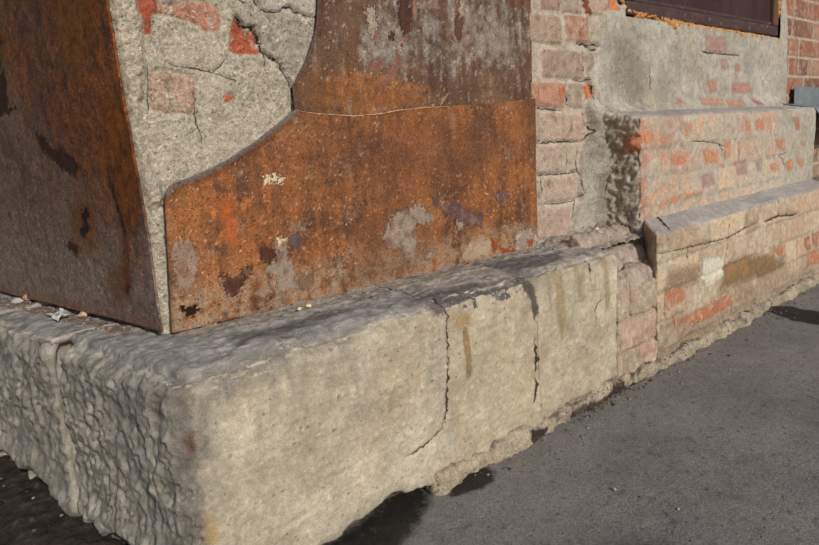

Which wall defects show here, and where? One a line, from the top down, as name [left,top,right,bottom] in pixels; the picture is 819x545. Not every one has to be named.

crack [168,61,235,80]
crack [235,0,316,89]
corrosion [386,0,413,41]
corrosion [454,14,465,43]
flaking render [701,80,750,106]
corrosion [34,130,88,178]
peeling [260,173,285,185]
peeling [381,203,435,263]
corrosion [216,243,277,299]
damp [187,250,562,396]
crack [408,310,450,456]
crack [533,343,541,402]